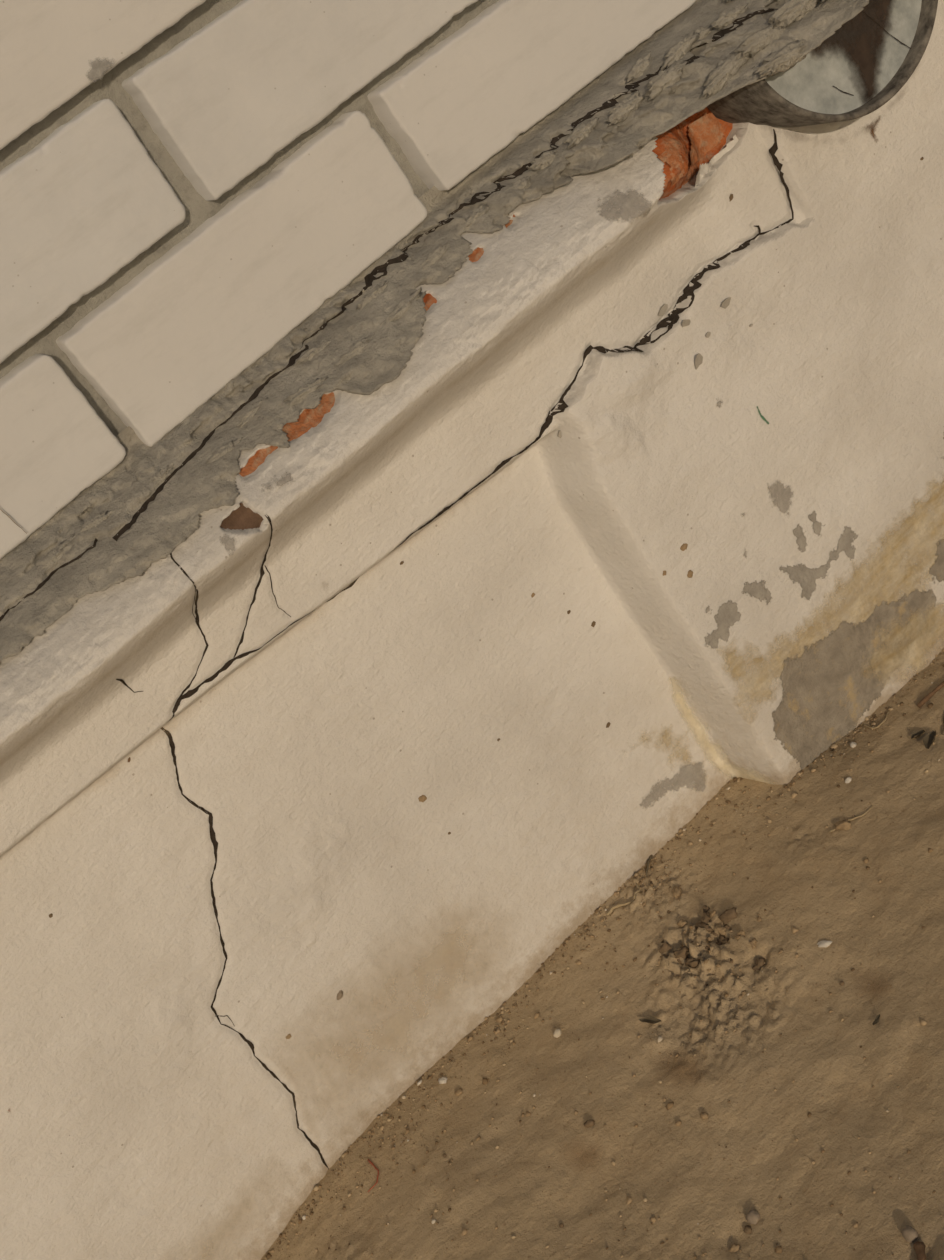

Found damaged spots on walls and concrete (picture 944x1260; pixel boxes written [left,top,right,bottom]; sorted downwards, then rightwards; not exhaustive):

flaking render [652,107,738,200]
crack [0,8,794,621]
flaking render [423,293,437,311]
flaking render [239,392,335,477]
flaking render [220,503,264,530]
peeling [704,580,772,649]
peeling [768,482,857,600]
leakage [727,482,944,702]
peeling [772,540,944,770]
leakage [673,682,769,784]
peeling [640,763,705,807]
crack [160,514,359,1170]